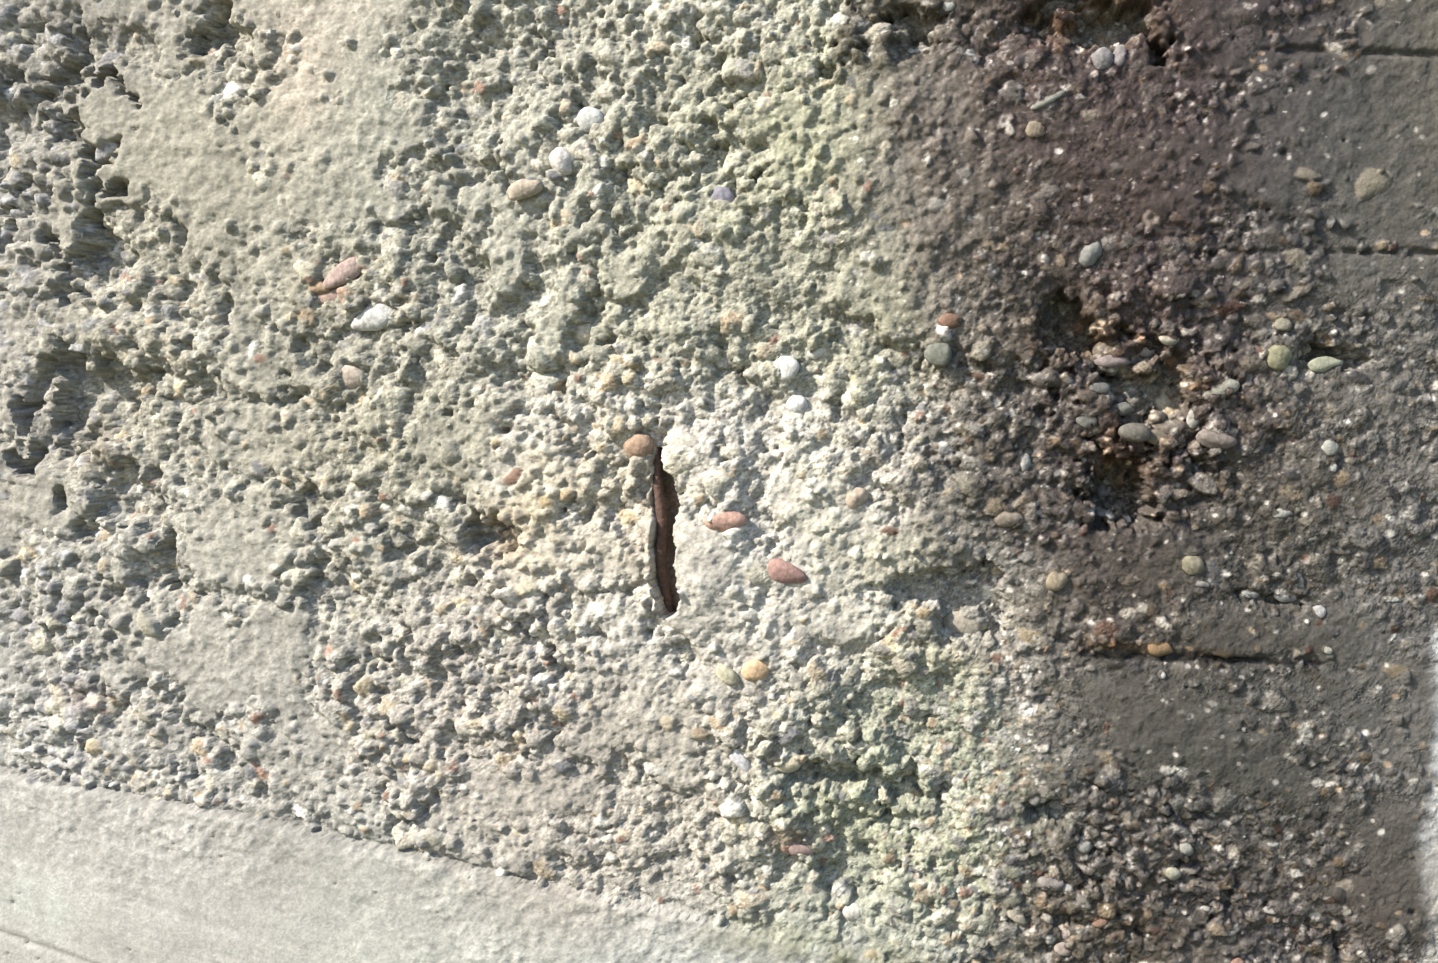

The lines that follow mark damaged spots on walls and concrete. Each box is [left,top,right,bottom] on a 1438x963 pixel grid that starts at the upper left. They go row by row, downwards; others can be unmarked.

hole [190,2,254,71]
spalling [876,5,940,55]
hole [1015,0,1171,66]
spalling [0,32,140,309]
hole [1299,343,1361,371]
hole [1038,291,1206,528]
spalling [14,339,183,590]
hole [465,513,523,563]
hole [885,557,1007,638]
spalling [1234,590,1280,604]
spalling [794,752,952,805]
hole [1024,798,1088,825]